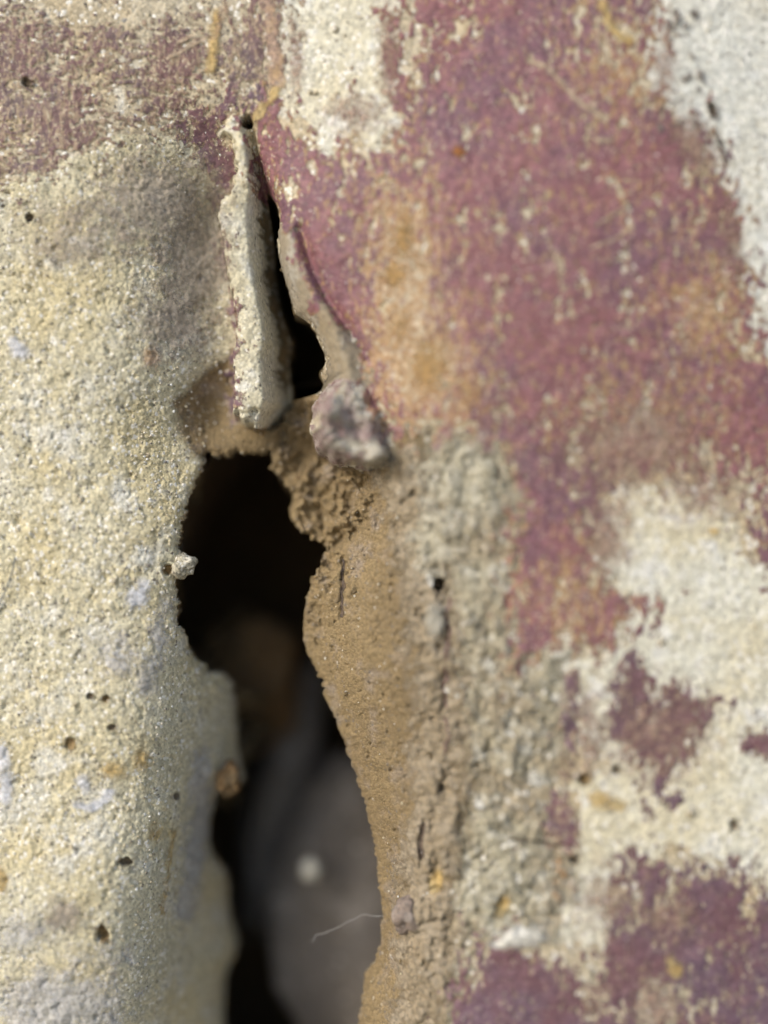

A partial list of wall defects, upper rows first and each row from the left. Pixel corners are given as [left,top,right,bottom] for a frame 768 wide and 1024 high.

crack [267,191,326,403]
spalling [173,230,427,1024]
crack [339,558,347,618]
peeling [241,0,768,1024]